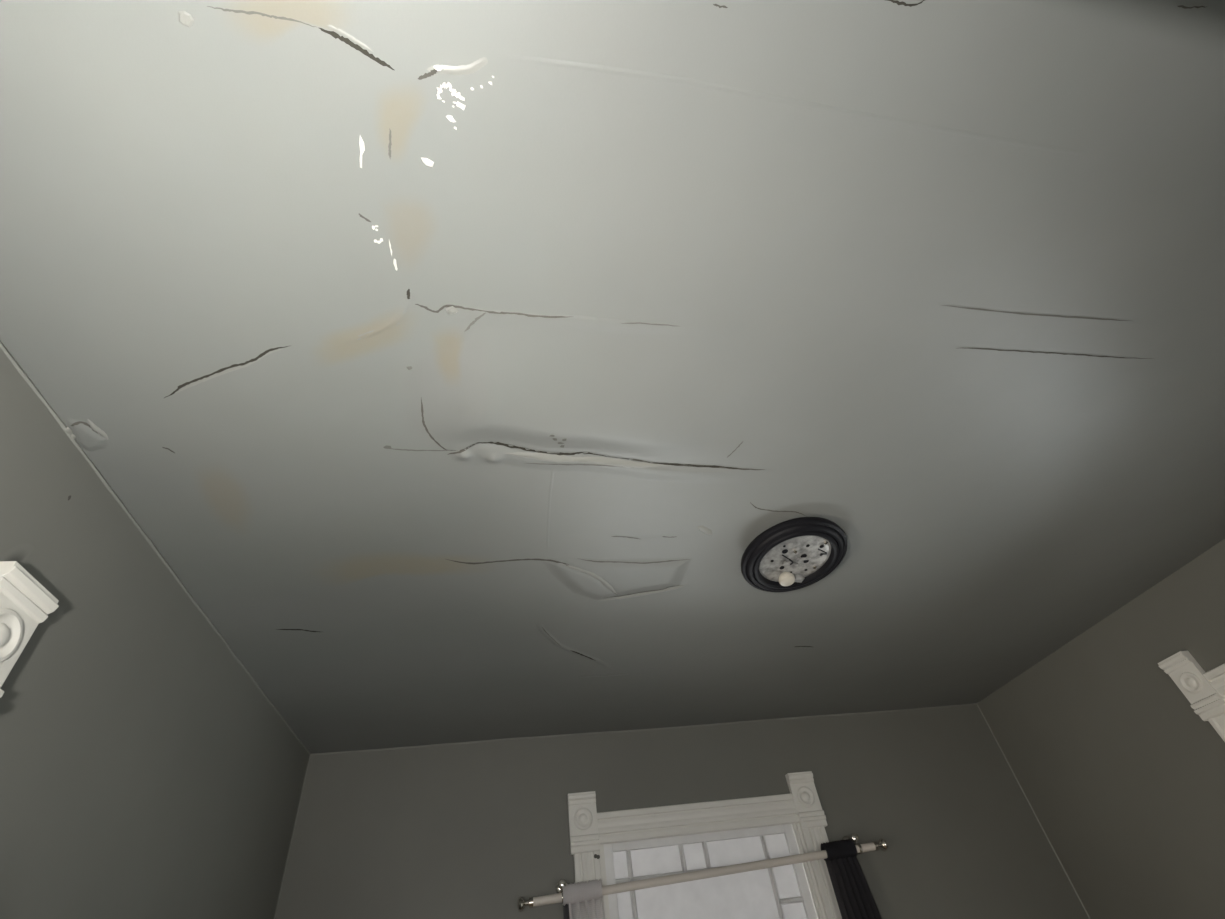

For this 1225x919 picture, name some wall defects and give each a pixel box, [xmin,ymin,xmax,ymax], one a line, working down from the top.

crack [207,6,488,80]
peeling [436,76,494,130]
crack [357,289,416,340]
crack [942,305,1129,321]
crack [164,346,288,398]
crack [969,348,1153,359]